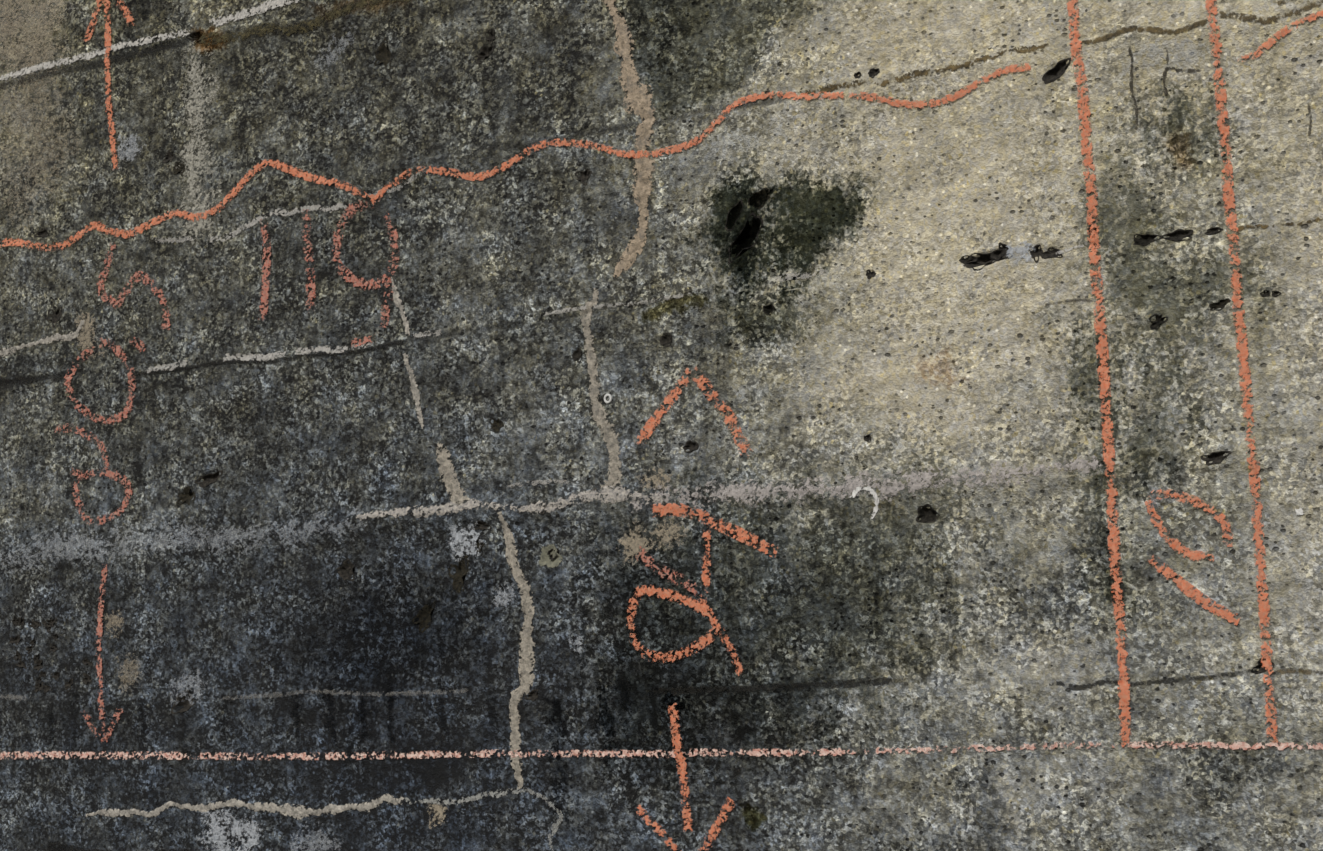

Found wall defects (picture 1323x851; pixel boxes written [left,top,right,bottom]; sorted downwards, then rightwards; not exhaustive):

crack [0,0,410,89]
crack [580,0,656,489]
damp [699,171,866,296]
crack [1045,297,1093,305]
crack [0,320,84,386]
damp [356,455,1101,563]
crack [46,277,563,851]
damp [103,610,124,636]
efflorescence [197,809,262,851]
damp [428,804,446,829]